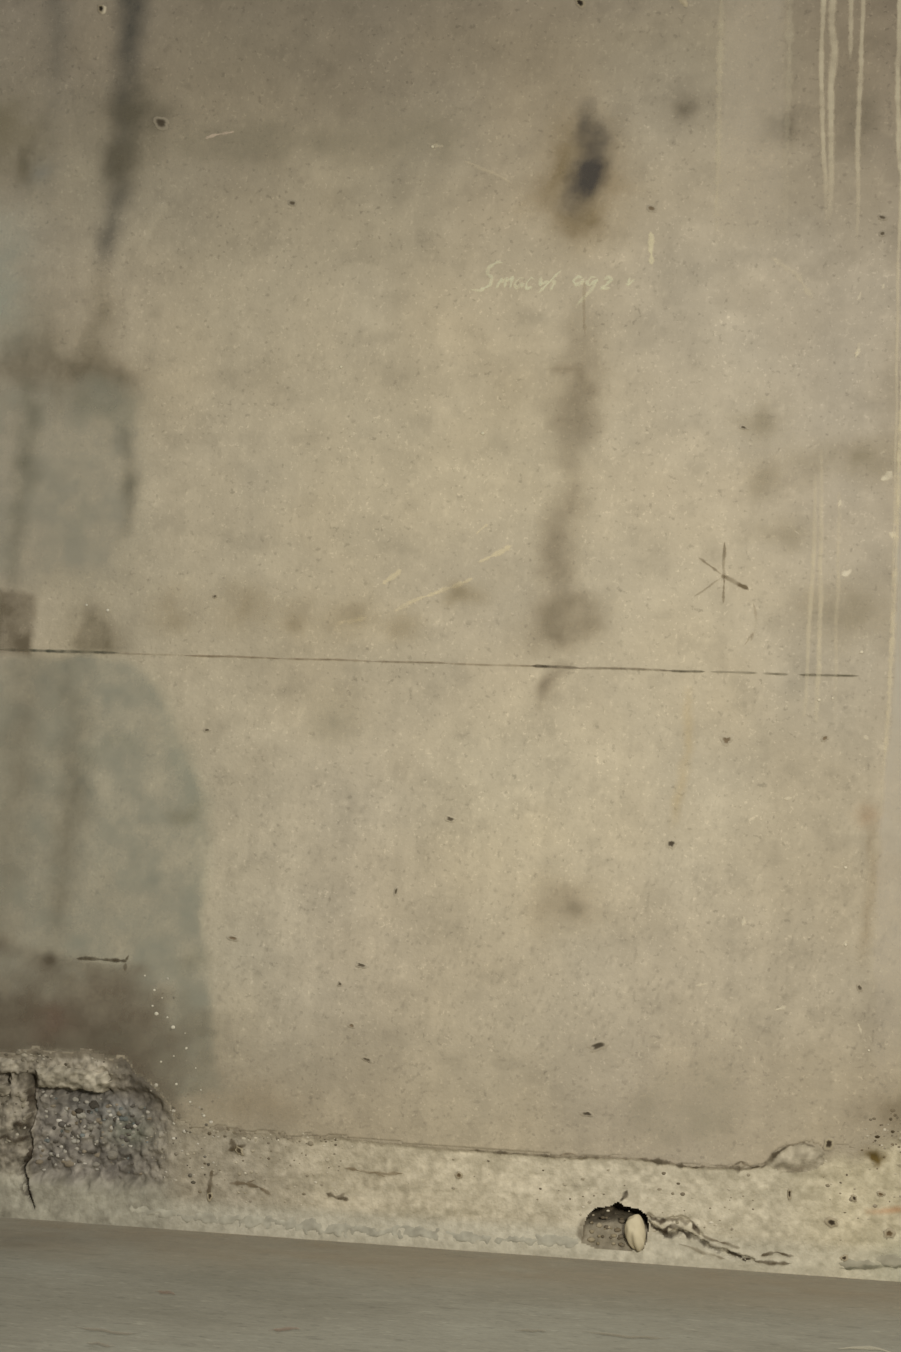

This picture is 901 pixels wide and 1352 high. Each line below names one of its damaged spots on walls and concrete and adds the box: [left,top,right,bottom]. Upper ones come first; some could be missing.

water stain [819,45,837,156]
water stain [556,148,603,230]
water stain [0,594,215,1114]
crack [0,1094,36,1163]
spalling [0,1042,901,1282]
crack [649,1216,790,1265]